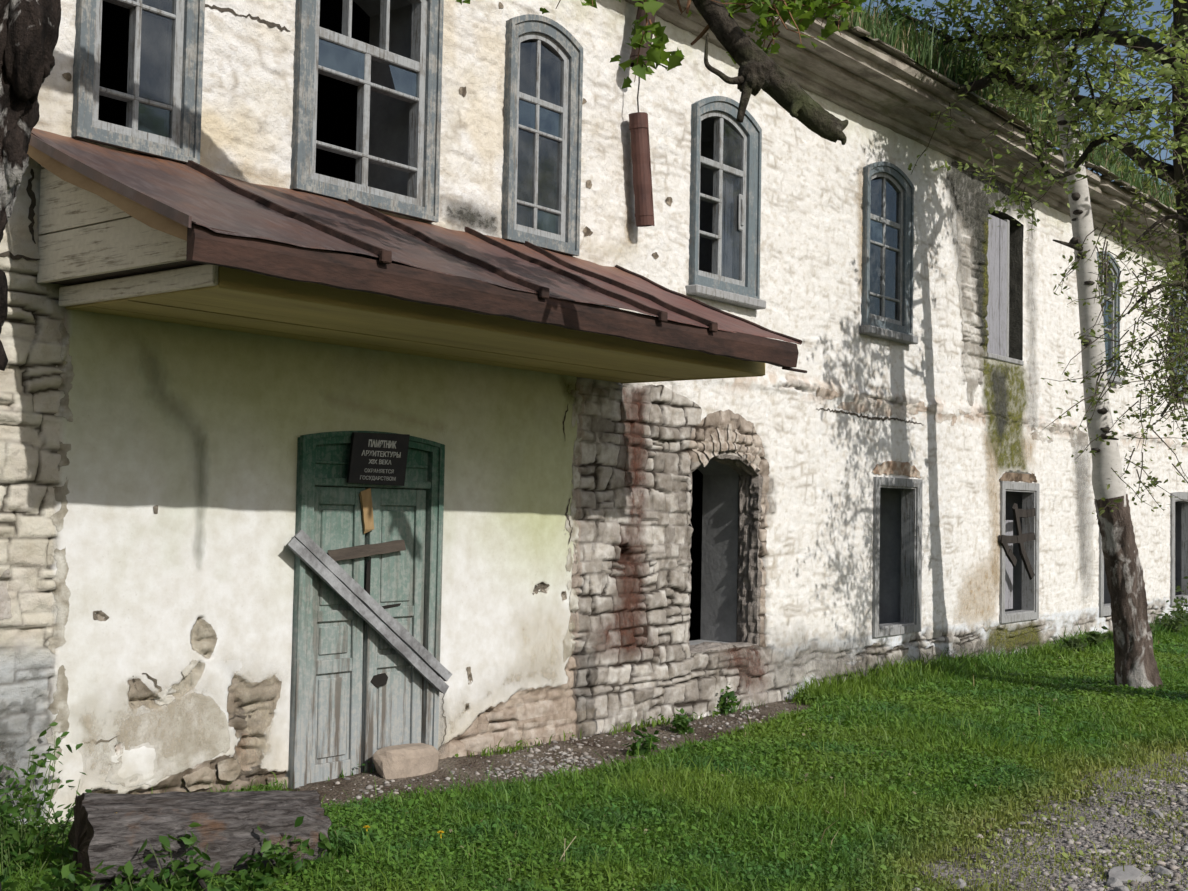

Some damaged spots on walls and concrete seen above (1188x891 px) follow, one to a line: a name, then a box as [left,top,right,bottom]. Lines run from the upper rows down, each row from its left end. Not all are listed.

crack [205,4,290,31]
crack [0,169,40,261]
damp [948,160,1033,349]
crack [818,408,922,424]
damp [990,372,1007,470]
rust [604,390,653,651]
spalling [93,610,109,621]
spalling [438,390,596,759]
flaking render [92,618,288,794]